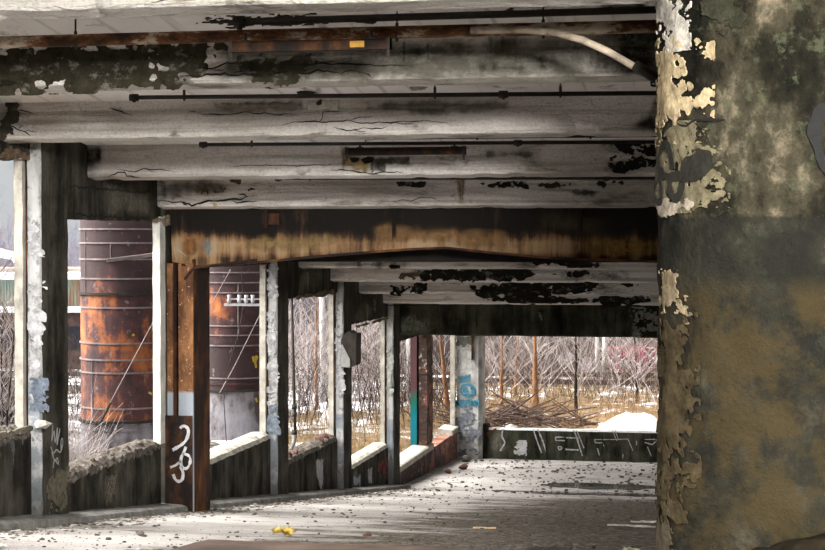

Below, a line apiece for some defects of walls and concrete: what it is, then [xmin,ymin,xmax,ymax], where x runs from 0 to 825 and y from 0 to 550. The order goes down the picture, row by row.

peeling [655,0,715,61]
peeling [0,43,228,160]
peeling [236,53,322,105]
crack [190,111,444,132]
peeling [596,120,731,218]
rust [377,227,506,246]
peeling [27,226,49,412]
spalling [0,425,33,441]
peeling [389,262,702,550]